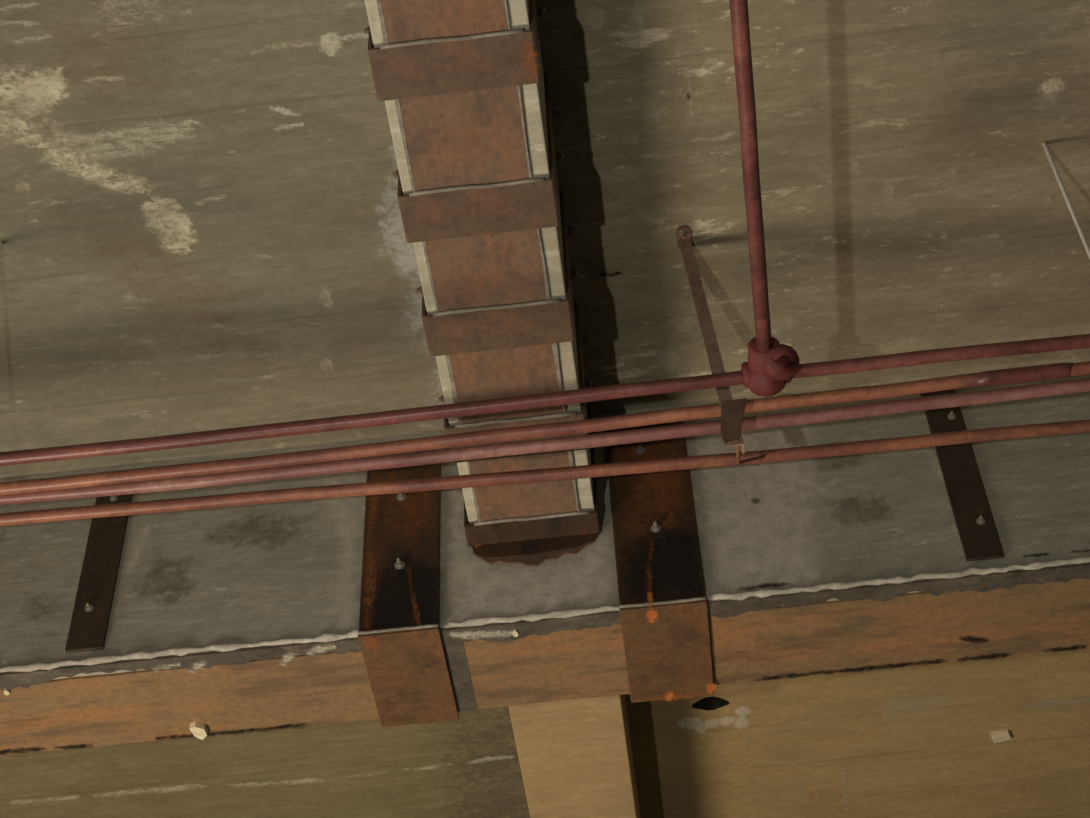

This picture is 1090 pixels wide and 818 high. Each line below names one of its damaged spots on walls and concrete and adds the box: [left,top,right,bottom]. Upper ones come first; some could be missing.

rust [646,573,658,623]
rust [652,683,716,701]